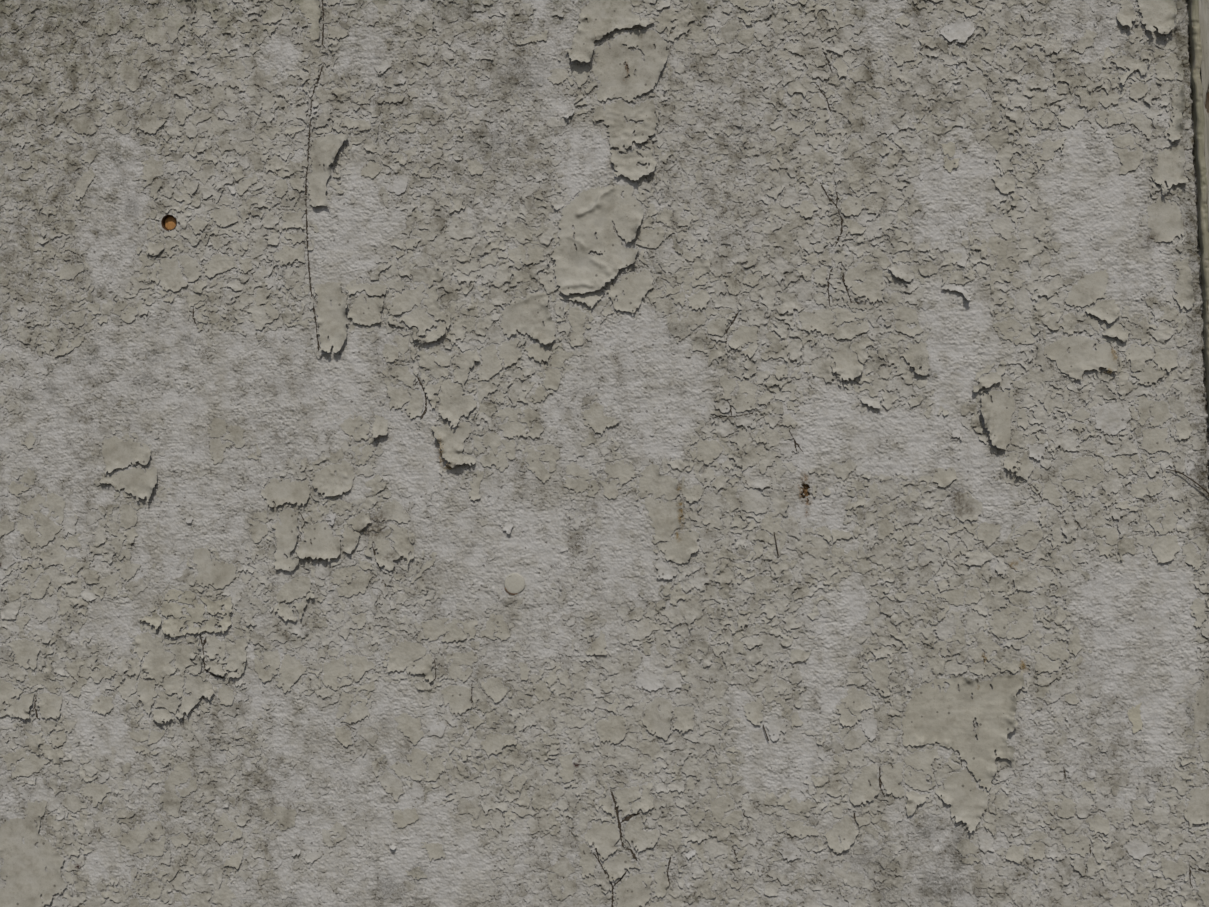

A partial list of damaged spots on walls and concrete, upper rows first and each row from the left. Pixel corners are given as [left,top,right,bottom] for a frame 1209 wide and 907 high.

crack [305,0,326,350]
crack [594,789,642,907]